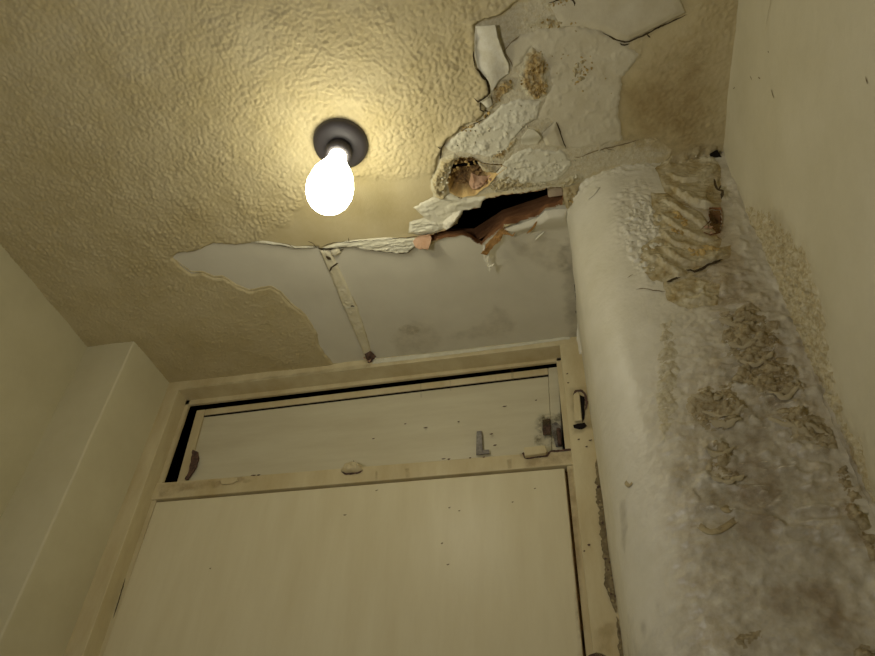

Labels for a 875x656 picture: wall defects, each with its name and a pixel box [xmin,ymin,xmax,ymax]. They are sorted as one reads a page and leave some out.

peeling [173,0,732,364]